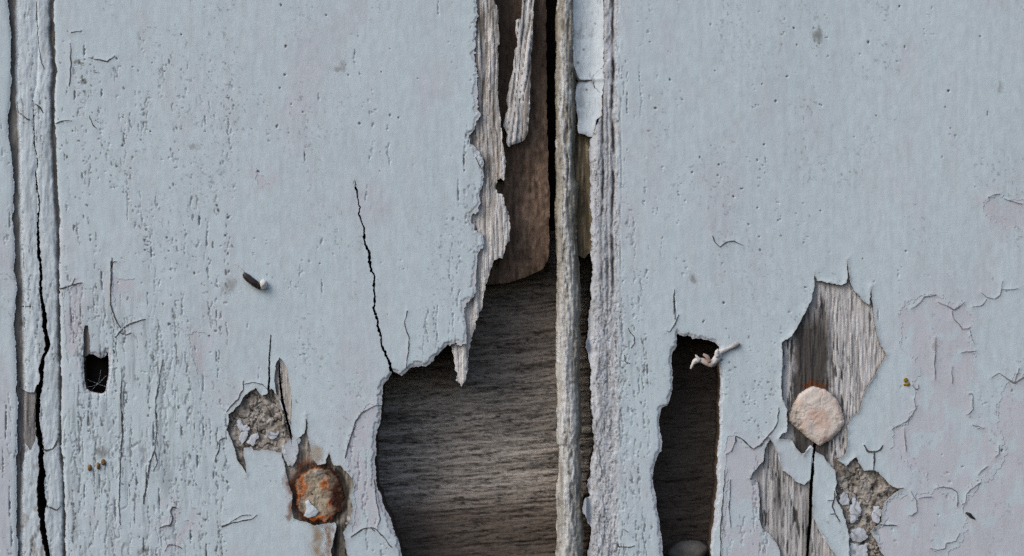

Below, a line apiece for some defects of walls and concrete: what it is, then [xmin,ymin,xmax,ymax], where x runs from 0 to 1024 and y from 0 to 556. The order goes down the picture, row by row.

crack [17,103,97,261]
crack [354,180,410,376]
crack [20,278,82,556]
peeling [227,357,386,556]
crack [806,442,840,556]
peeling [721,266,1024,556]
crack [864,282,1024,526]